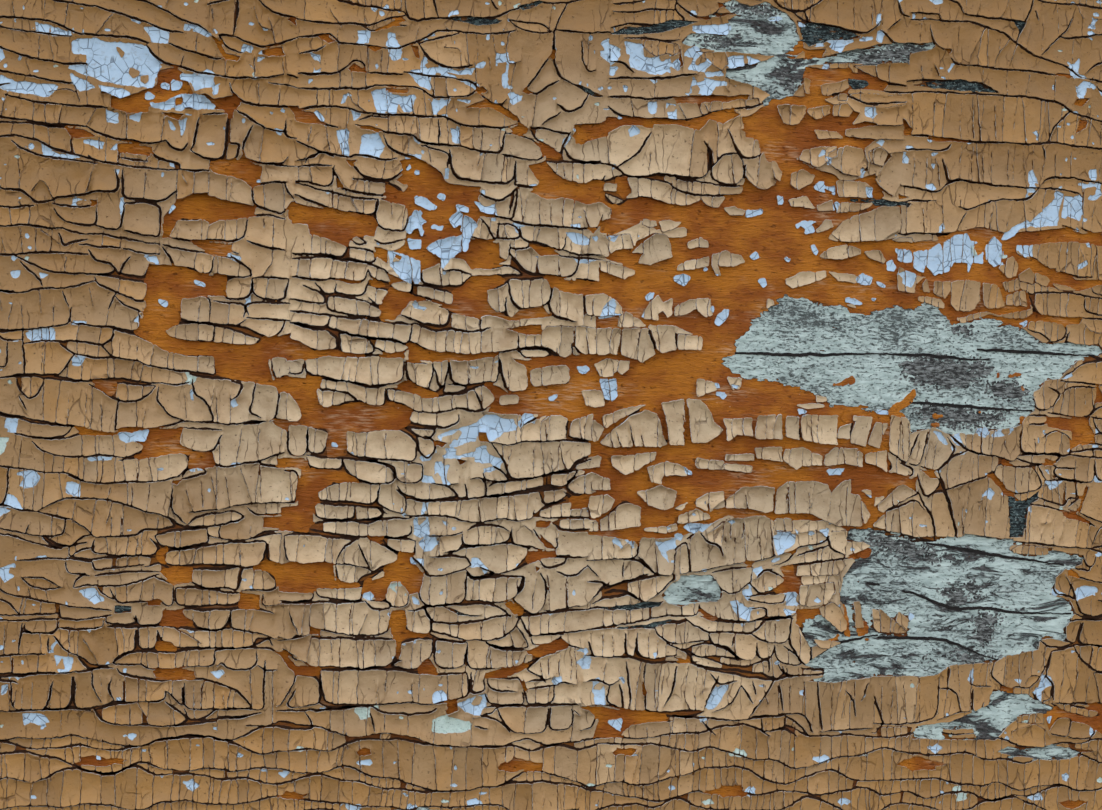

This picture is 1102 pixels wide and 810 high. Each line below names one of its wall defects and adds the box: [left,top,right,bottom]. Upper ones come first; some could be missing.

crack [0,3,149,44]
crack [298,68,477,104]
crack [0,134,182,204]
crack [905,91,1102,189]
peeling [410,312,612,394]
peeling [487,277,703,363]
peeling [600,405,668,448]
peeling [721,268,1102,547]
crack [407,476,563,514]
peeling [611,452,692,510]
crack [319,670,470,706]
peeling [881,620,1102,810]